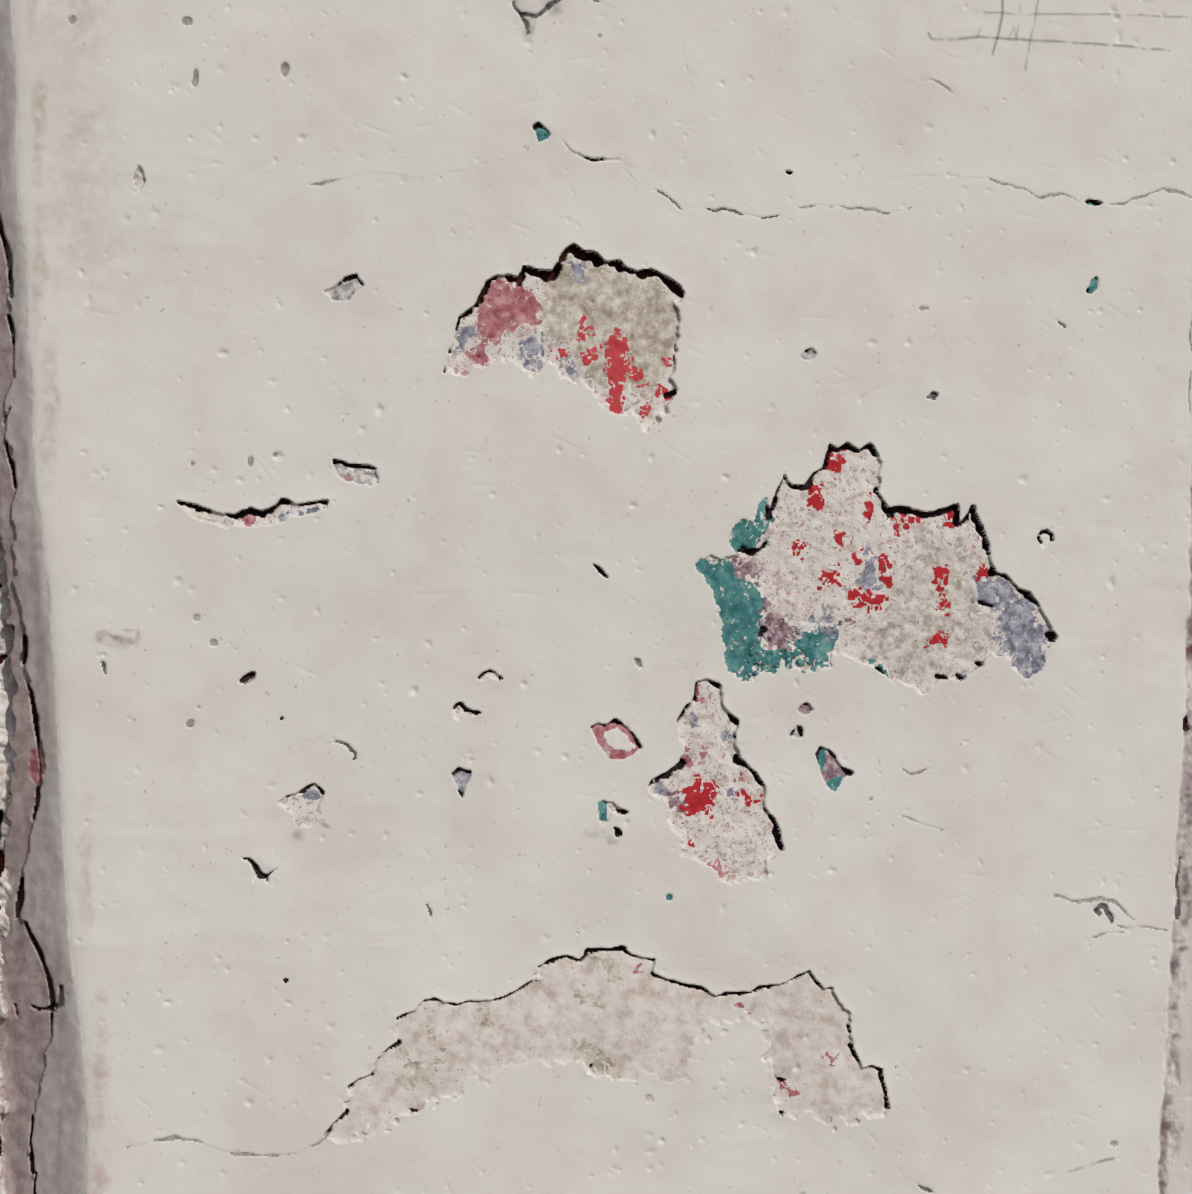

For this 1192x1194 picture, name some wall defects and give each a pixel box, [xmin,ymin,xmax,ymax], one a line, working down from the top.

crack [309,178,340,186]
crack [657,190,911,219]
crack [989,178,1076,201]
crack [1110,187,1192,205]
peeling [443,244,684,433]
flaking render [177,498,328,528]
peeling [695,443,1057,694]
spalling [591,718,642,759]
spalling [790,703,812,738]
peeling [648,679,784,883]
spalling [815,747,853,791]
peeling [326,945,896,1144]